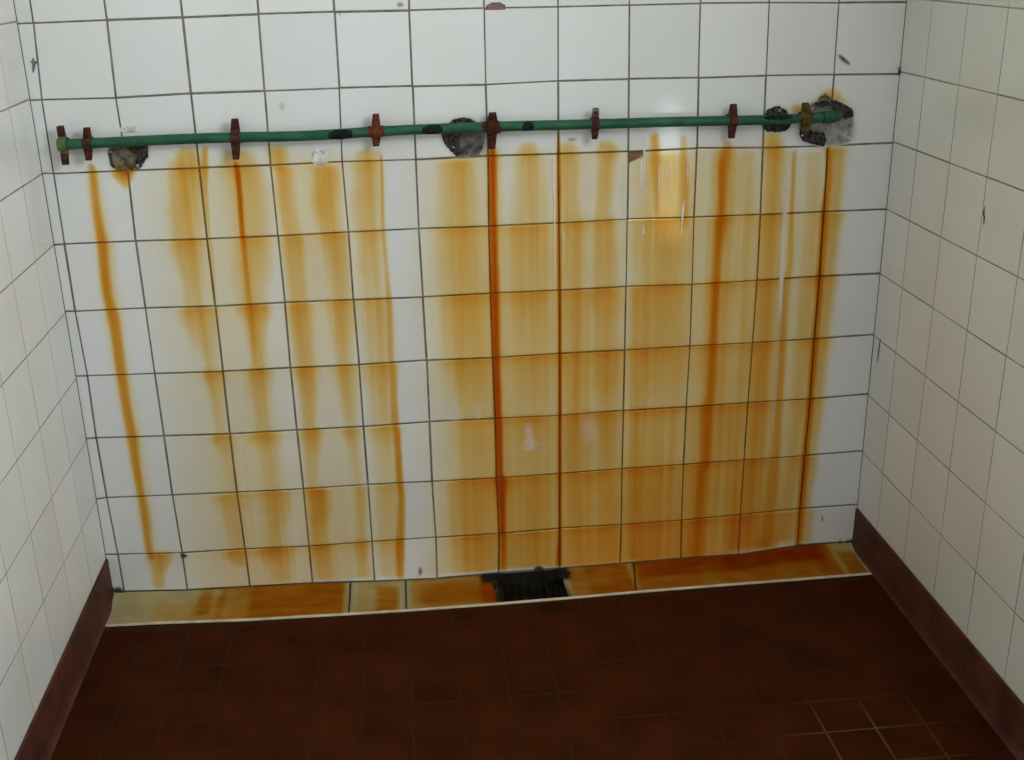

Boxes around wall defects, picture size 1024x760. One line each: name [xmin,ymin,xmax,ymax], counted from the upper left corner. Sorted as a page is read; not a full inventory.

spalling [422,117,485,158]
spalling [762,99,855,148]
spalling [108,146,149,173]